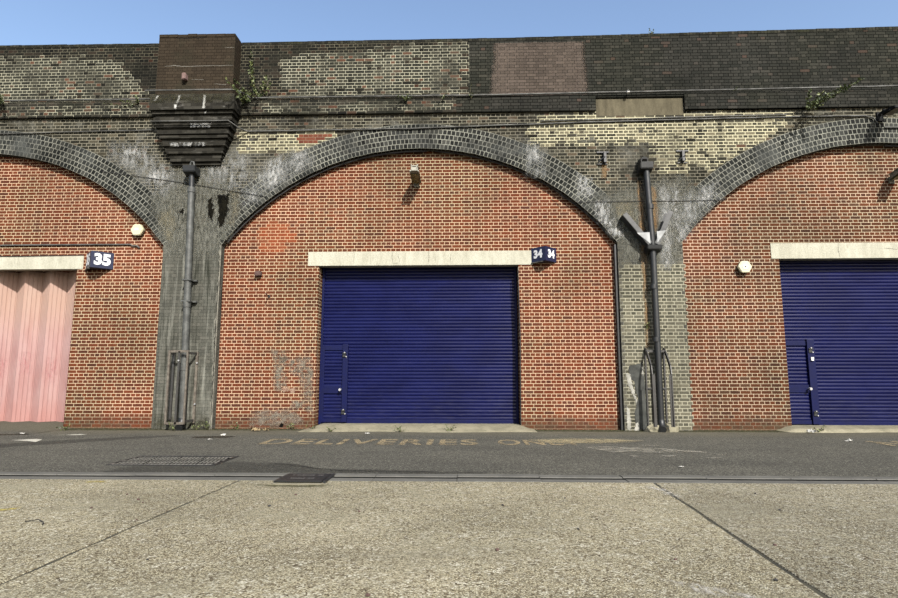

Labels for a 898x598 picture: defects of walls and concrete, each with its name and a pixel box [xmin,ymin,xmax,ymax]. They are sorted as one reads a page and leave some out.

water stain [123,150,247,256]
water stain [252,152,309,198]